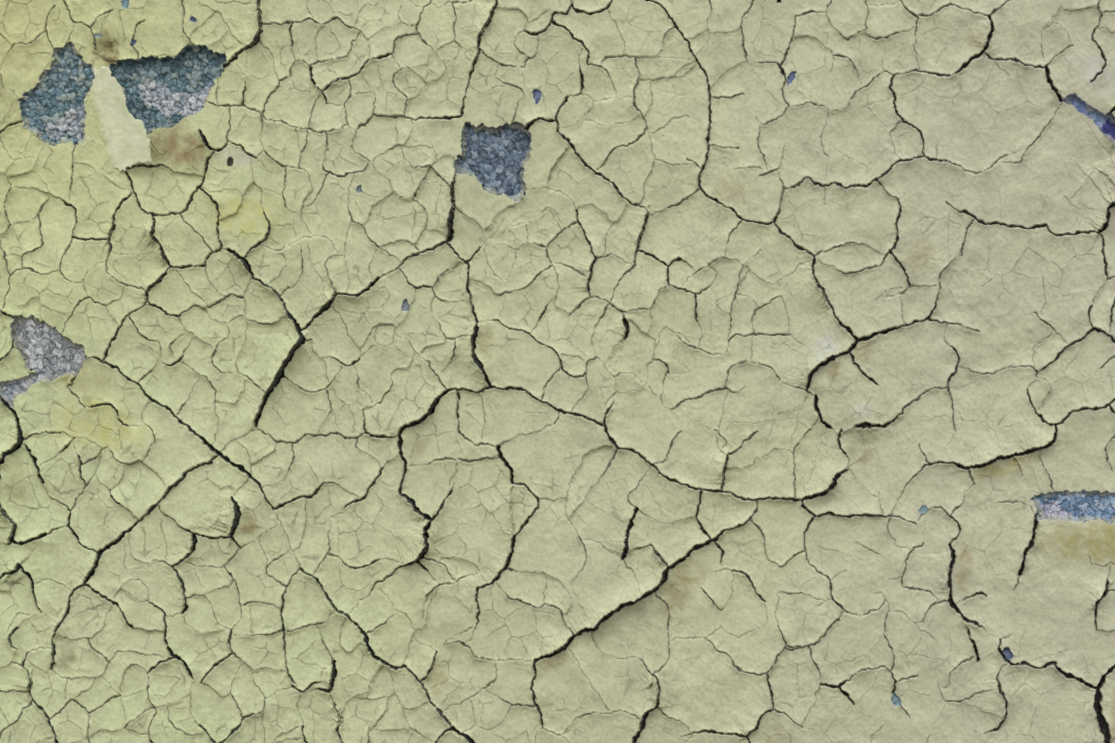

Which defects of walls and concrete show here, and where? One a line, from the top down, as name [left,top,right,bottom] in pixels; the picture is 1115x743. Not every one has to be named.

crack [1064,0,1115,84]
peeling [18,39,227,172]
crack [0,0,525,335]
peeling [454,122,531,201]
crack [473,0,1074,436]
crack [1062,171,1096,210]
peeling [1061,93,1115,215]
peeling [0,315,87,408]
peeling [1030,490,1115,524]
crack [937,625,1115,743]